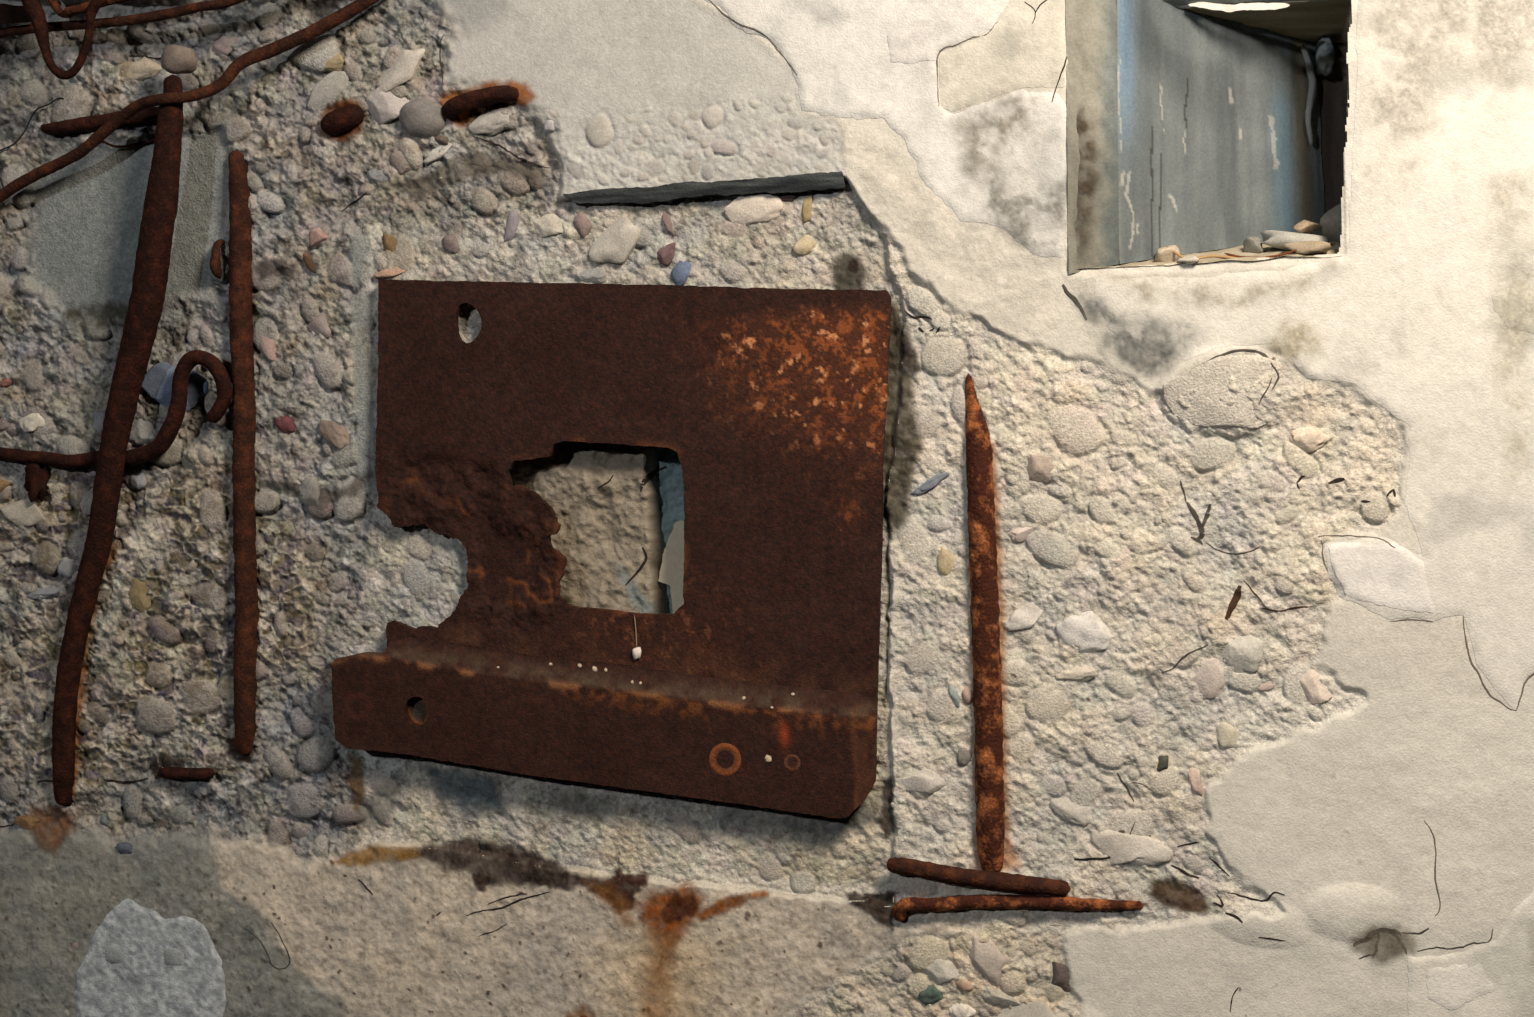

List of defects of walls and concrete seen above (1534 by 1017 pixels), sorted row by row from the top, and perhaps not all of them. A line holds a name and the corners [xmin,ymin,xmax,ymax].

corrosion [442,82,534,125]
spalling [0,0,1068,903]
corrosion [994,507,1004,657]
spalling [793,0,1534,1017]
crack [1396,616,1534,711]
damp [473,875,489,891]
damp [528,872,569,890]
corrosion [589,868,768,1017]